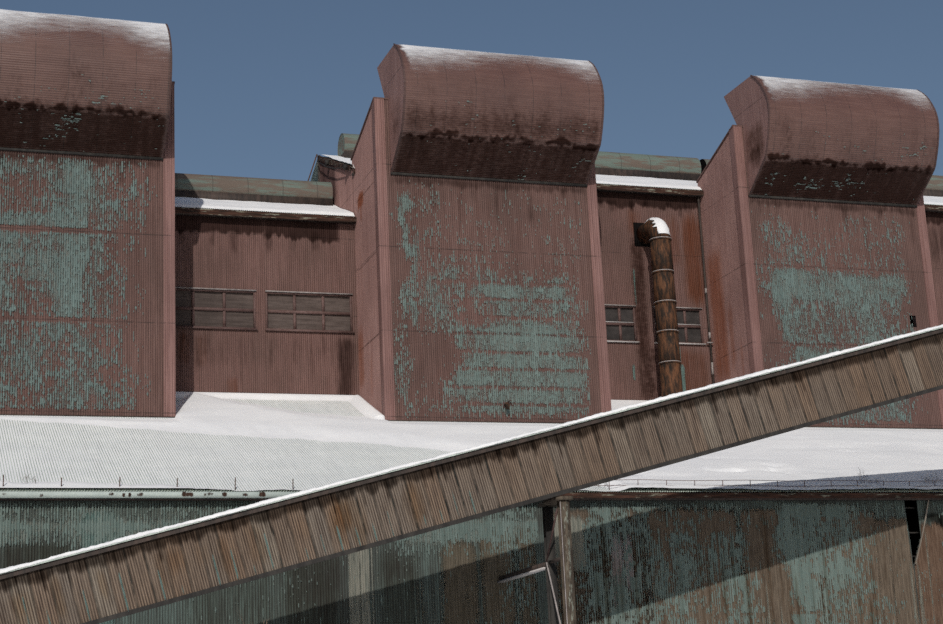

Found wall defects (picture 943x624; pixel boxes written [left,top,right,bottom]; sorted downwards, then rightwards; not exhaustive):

peeling [0,151,157,414]
peeling [391,168,591,419]
peeling [756,171,917,367]
peeling [827,395,928,425]
peeling [385,503,542,624]
peeling [557,500,940,624]